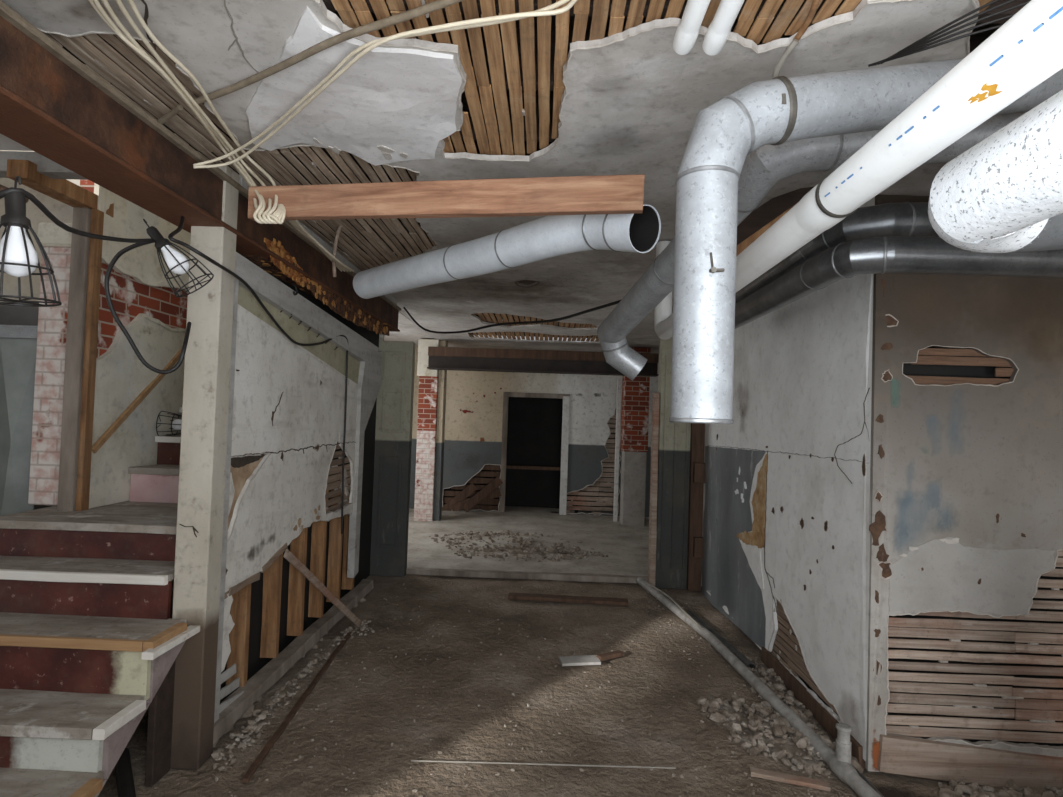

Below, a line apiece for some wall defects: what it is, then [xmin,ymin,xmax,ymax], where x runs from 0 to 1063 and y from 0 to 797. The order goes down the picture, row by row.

flaking render [39,29,420,186]
crack [224,0,259,73]
flaking render [313,0,685,162]
flaking render [698,0,721,37]
flaking render [727,0,914,54]
rust [968,83,1002,104]
flaking render [299,218,439,271]
spalling [96,255,188,364]
crack [232,441,356,461]
crack [707,388,870,613]
peeling [702,434,842,723]
spalling [869,490,1063,750]